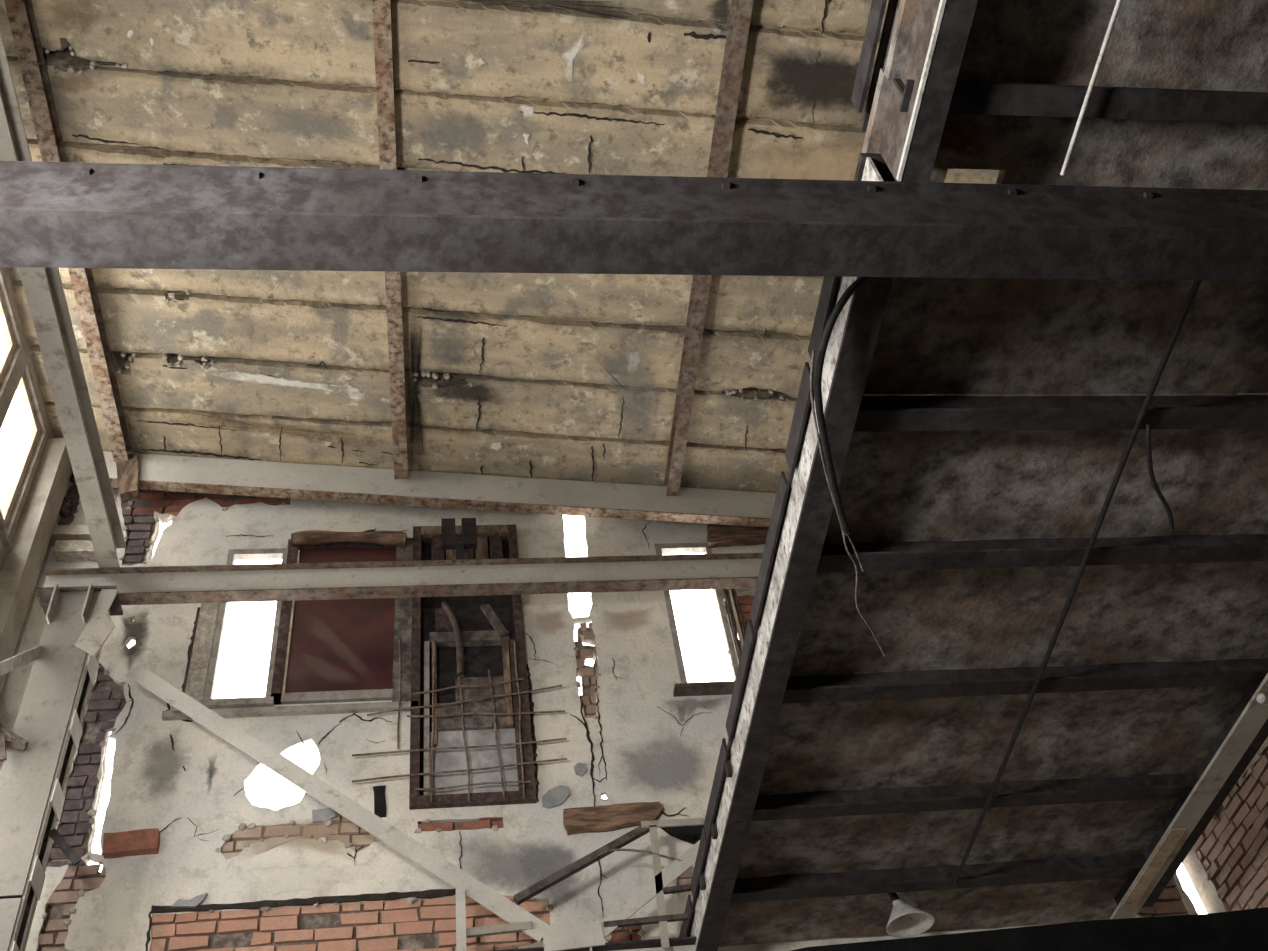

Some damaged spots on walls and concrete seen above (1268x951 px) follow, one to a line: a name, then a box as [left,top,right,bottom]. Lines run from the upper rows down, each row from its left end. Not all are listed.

water stain [768,58,875,109]
flaking render [119,490,291,565]
crack [570,658,623,806]
water stain [629,745,697,788]
flaking render [38,662,126,951]
flaking render [215,812,381,860]
water stain [479,850,571,896]
crack [597,860,605,918]
spalling [791,748,1268,951]
flaking render [150,895,554,951]